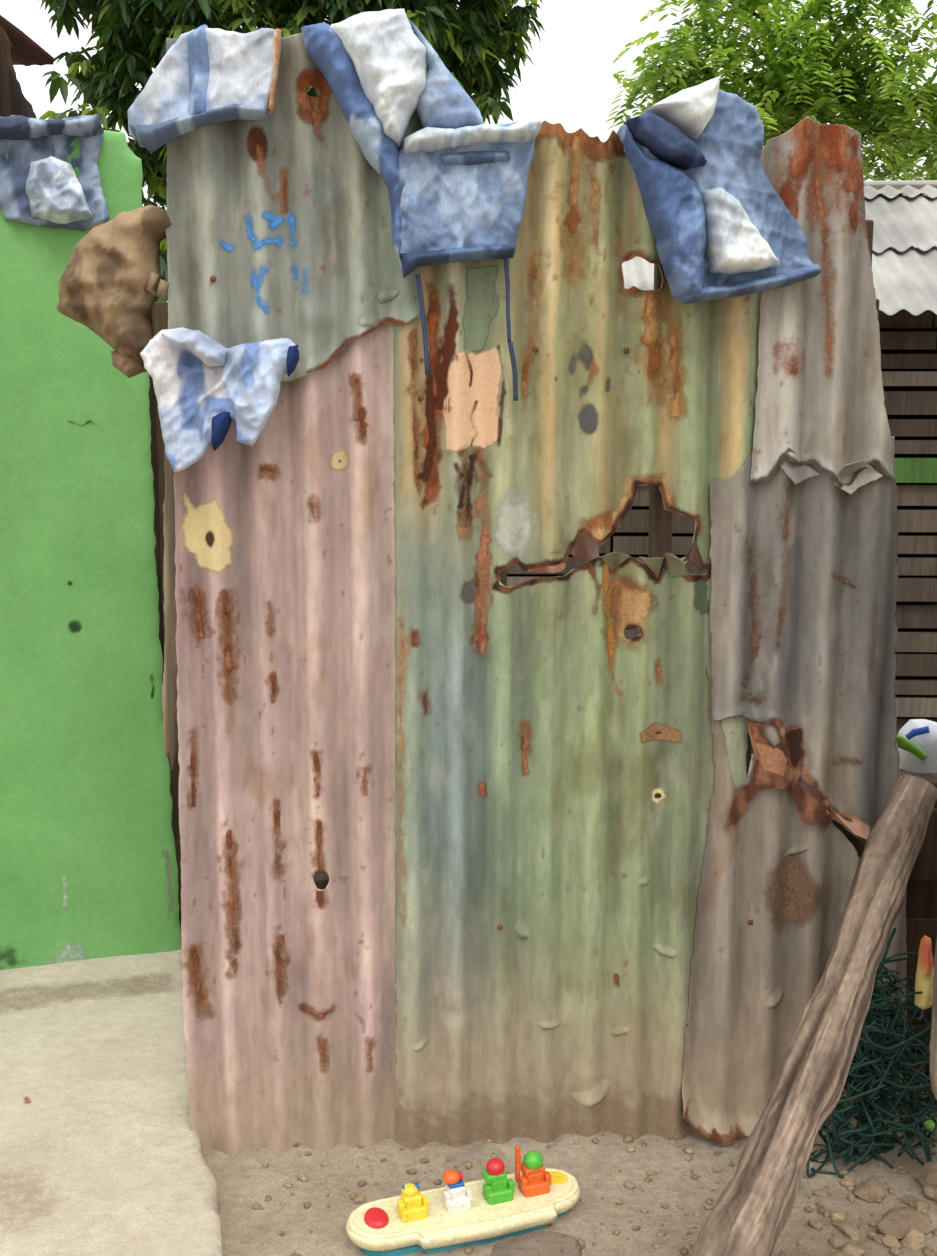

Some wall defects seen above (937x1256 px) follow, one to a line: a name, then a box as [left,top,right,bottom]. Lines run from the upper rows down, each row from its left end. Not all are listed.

corrosion [296,69,331,141]
corrosion [535,121,626,286]
corrosion [775,117,867,374]
corrosion [306,285,459,508]
corrosion [617,245,690,418]
corrosion [454,448,493,654]
corrosion [579,474,702,540]
corrosion [189,588,240,704]
corrosion [755,729,802,777]
corrosion [223,830,241,978]
corrosion [273,935,290,998]
corrosion [314,819,325,871]